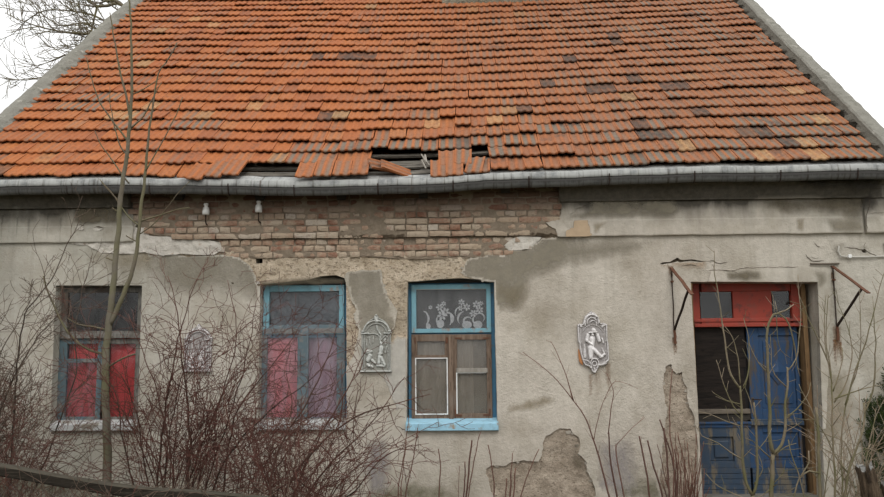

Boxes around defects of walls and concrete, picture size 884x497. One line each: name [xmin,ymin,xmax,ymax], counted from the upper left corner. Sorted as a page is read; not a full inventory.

flaking render [128,187,562,366]
crack [660,245,824,272]
spalling [486,428,595,497]
spalling [659,364,698,497]